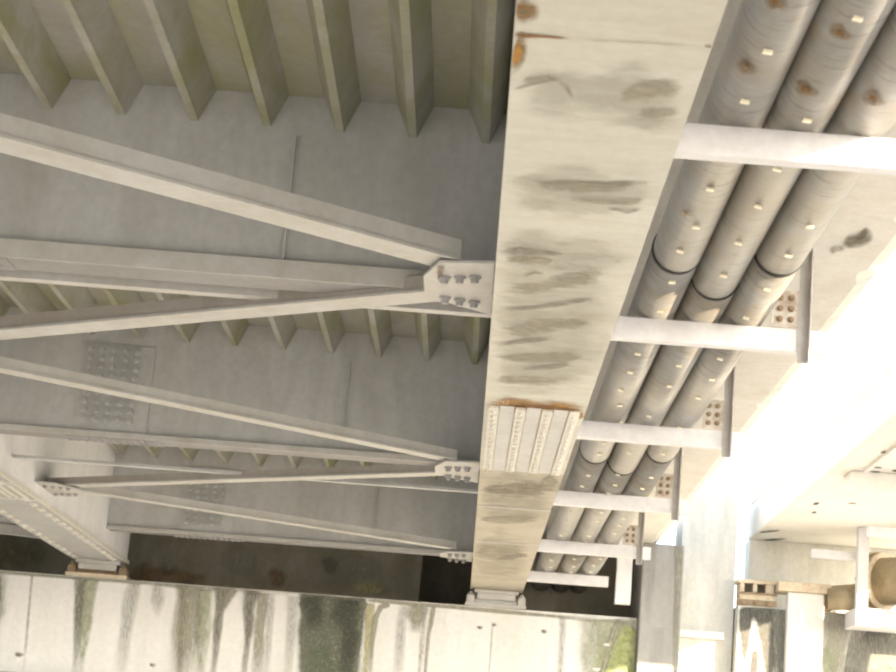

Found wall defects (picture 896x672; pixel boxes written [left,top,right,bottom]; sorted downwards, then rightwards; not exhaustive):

corrosion [516,5,536,19]
corrosion [831,24,850,39]
corrosion [512,40,525,64]
corrosion [797,82,816,96]
leakage [545,181,640,213]
leakage [511,248,590,293]
leakage [513,298,588,310]
leakage [507,320,583,344]
leakage [507,353,579,384]
corrosion [495,399,583,418]
leakage [0,536,272,667]
leakage [334,557,583,672]